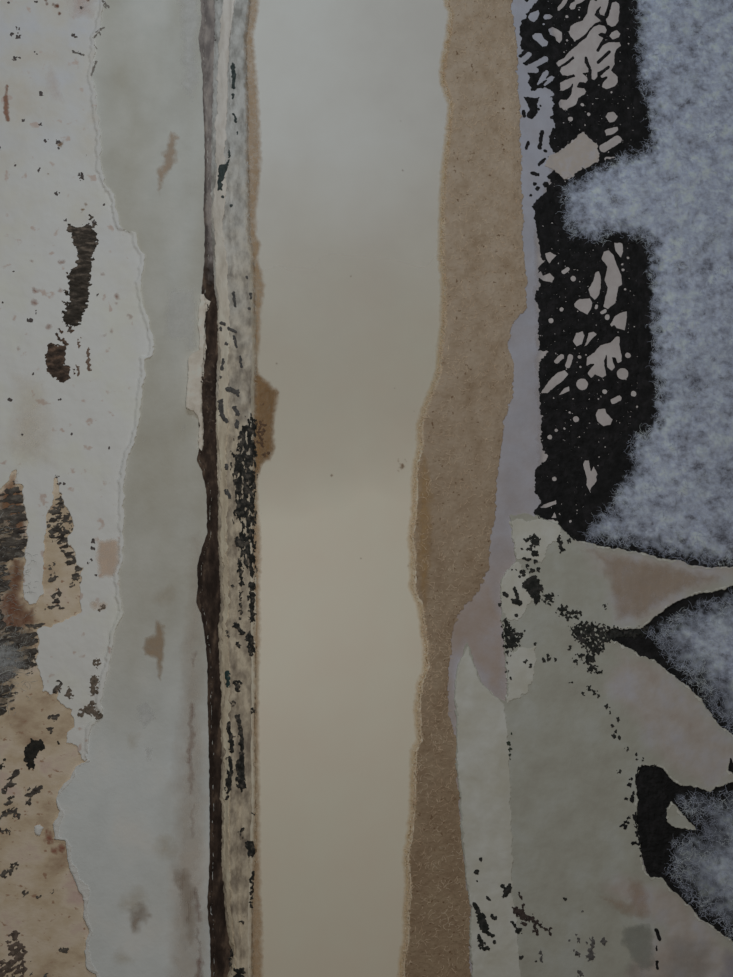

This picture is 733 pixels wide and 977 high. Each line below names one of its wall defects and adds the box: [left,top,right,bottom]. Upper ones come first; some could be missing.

peeling [0,0,154,761]
water stain [0,481,45,716]
water stain [52,680,74,699]
water stain [44,475,95,610]
water stain [77,658,103,720]
water stain [200,310,446,977]
water stain [0,714,60,835]
water stain [0,862,19,878]